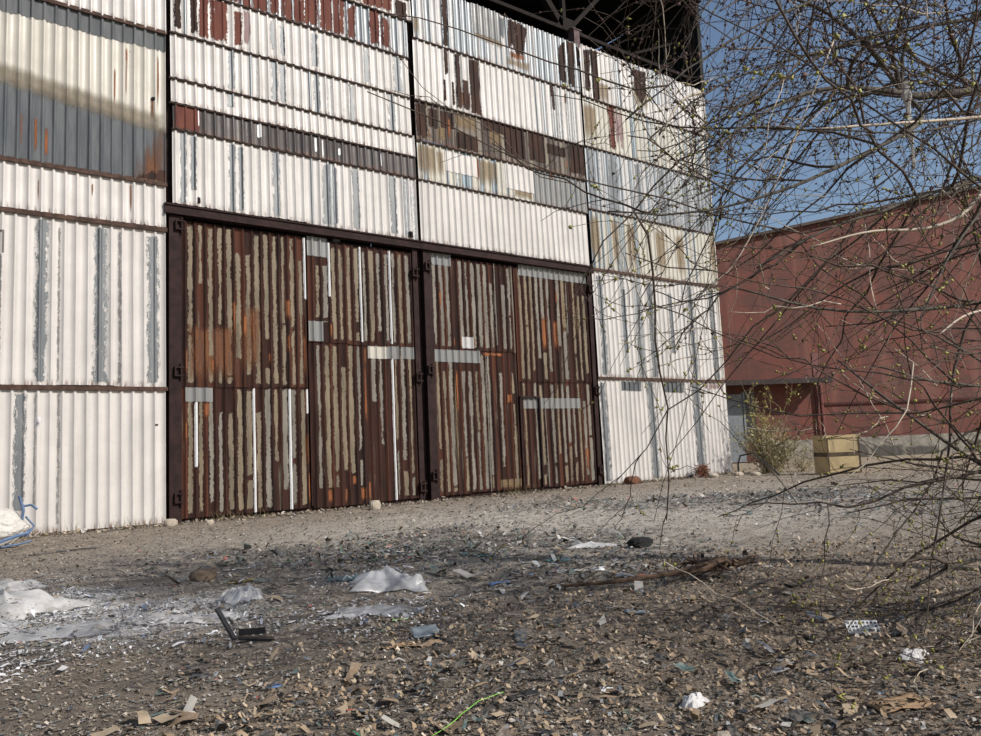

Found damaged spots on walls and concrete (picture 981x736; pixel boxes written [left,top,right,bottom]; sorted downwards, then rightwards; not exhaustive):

corrosion [174,104,201,132]
corrosion [173,0,418,47]
corrosion [415,0,585,182]
peeling [11,218,61,511]
peeling [91,227,122,383]
peeling [146,236,161,383]
corrosion [186,302,259,377]
peeling [431,261,612,492]
corrosion [541,295,578,347]
peeling [621,283,722,478]
corrosion [345,476,371,501]
corrosion [501,458,522,487]